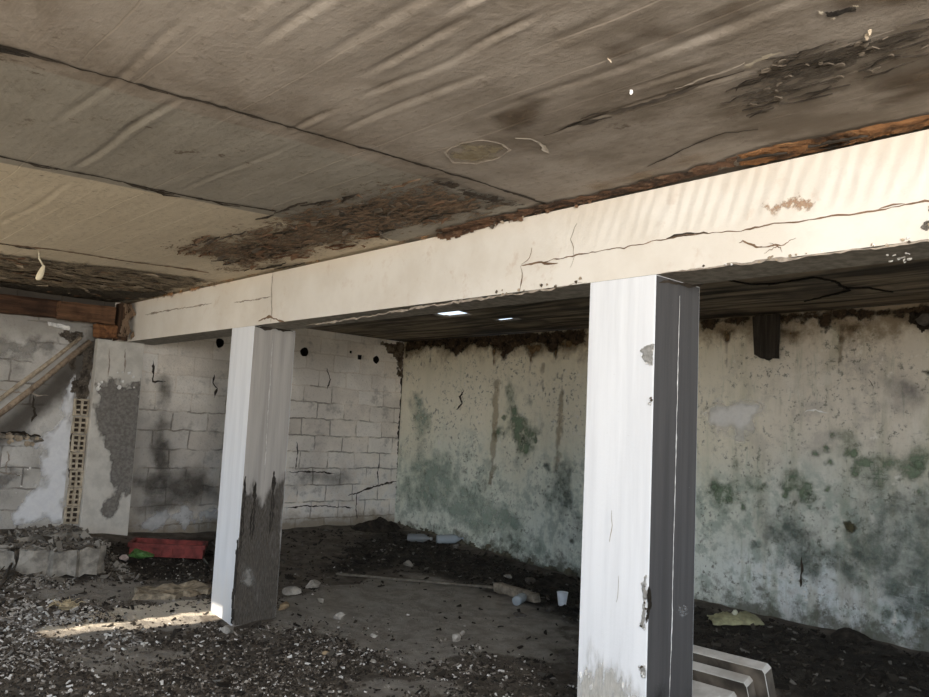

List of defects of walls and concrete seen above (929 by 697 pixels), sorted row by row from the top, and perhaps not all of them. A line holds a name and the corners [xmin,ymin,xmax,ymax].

corrosion [421,115,929,240]
peeling [0,254,212,303]
spalling [160,174,524,272]
crack [520,199,929,287]
crack [730,277,894,302]
spalling [766,304,929,333]
peeling [0,330,141,518]
mould [495,387,537,454]
mould [709,480,732,504]
mould [845,445,929,487]
water stain [231,471,285,626]
mould [830,497,929,618]